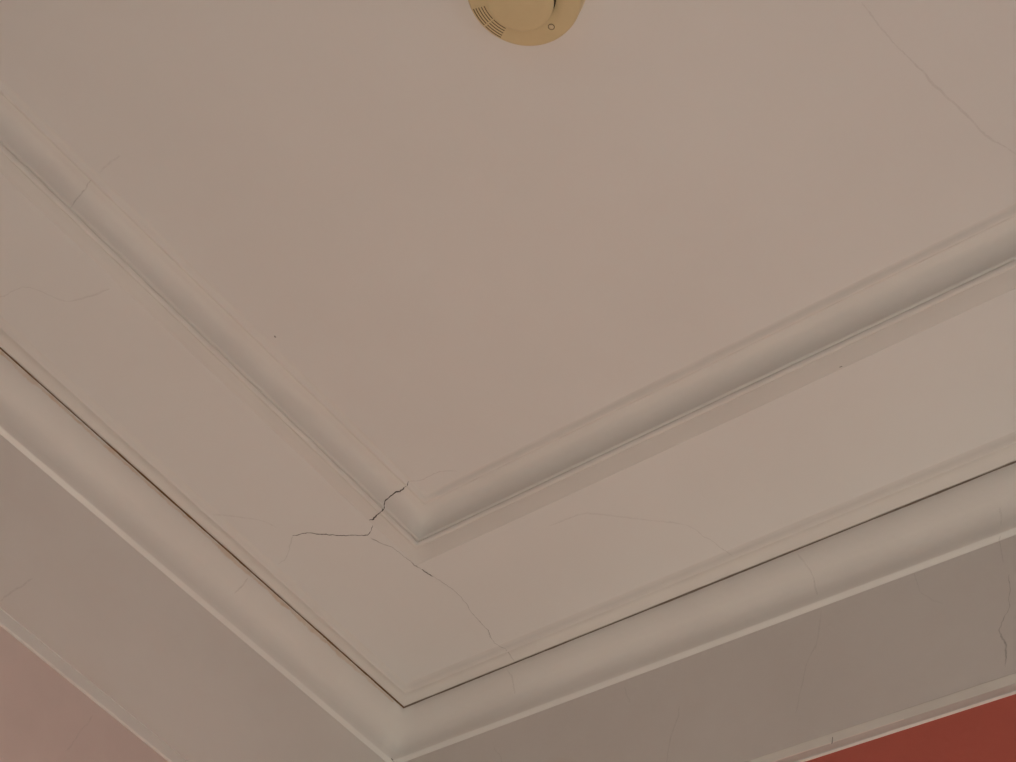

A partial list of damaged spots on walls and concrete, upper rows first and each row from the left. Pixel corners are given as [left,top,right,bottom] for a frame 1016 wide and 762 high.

crack [0,347,1016,708]